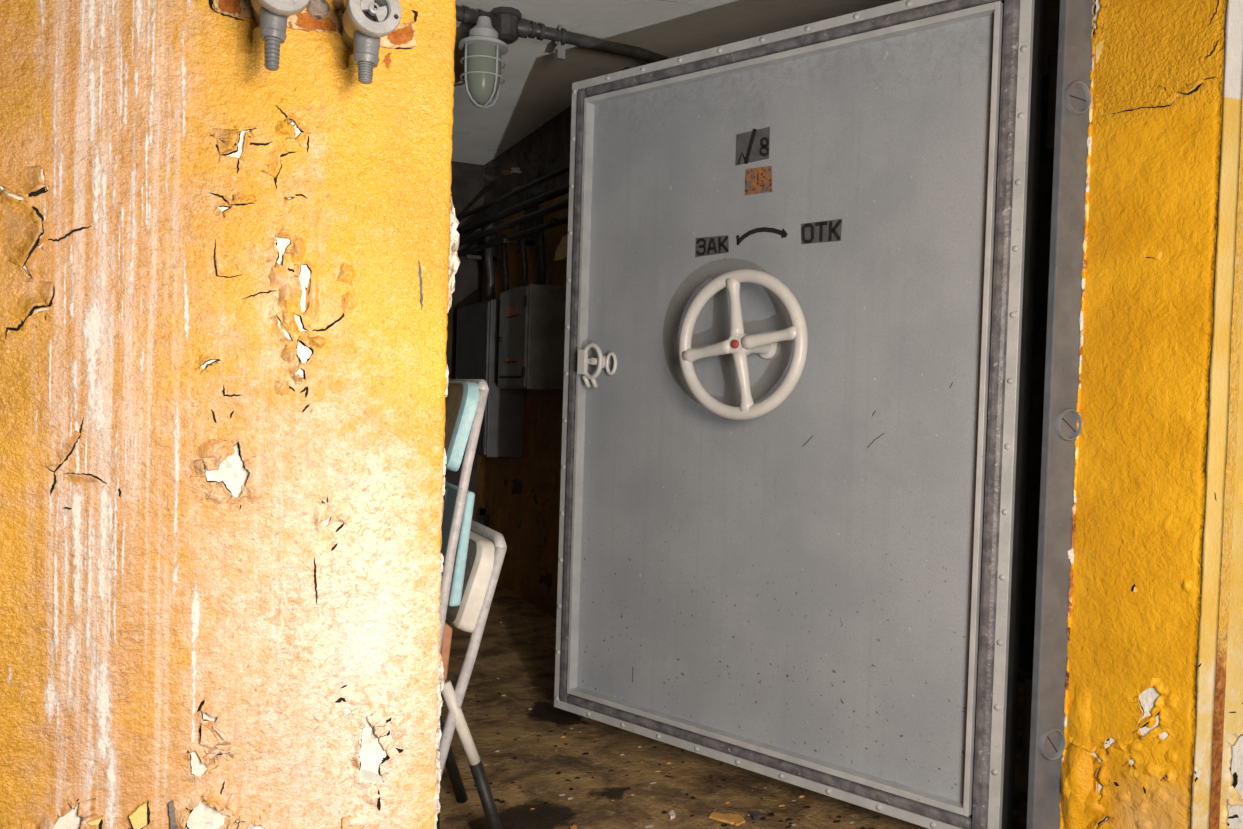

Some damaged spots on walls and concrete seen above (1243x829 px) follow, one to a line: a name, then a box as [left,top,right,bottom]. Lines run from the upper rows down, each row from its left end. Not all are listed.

crack [1094,0,1220,116]
crack [0,162,91,338]
crack [45,418,121,510]
water stain [34,0,186,829]
water stain [172,408,192,594]
spalling [186,385,264,509]
peeling [244,227,358,412]
spalling [1061,0,1110,763]
water stain [191,569,200,743]
peeling [168,700,271,829]
spalling [335,685,407,829]
spalling [1220,727,1243,829]